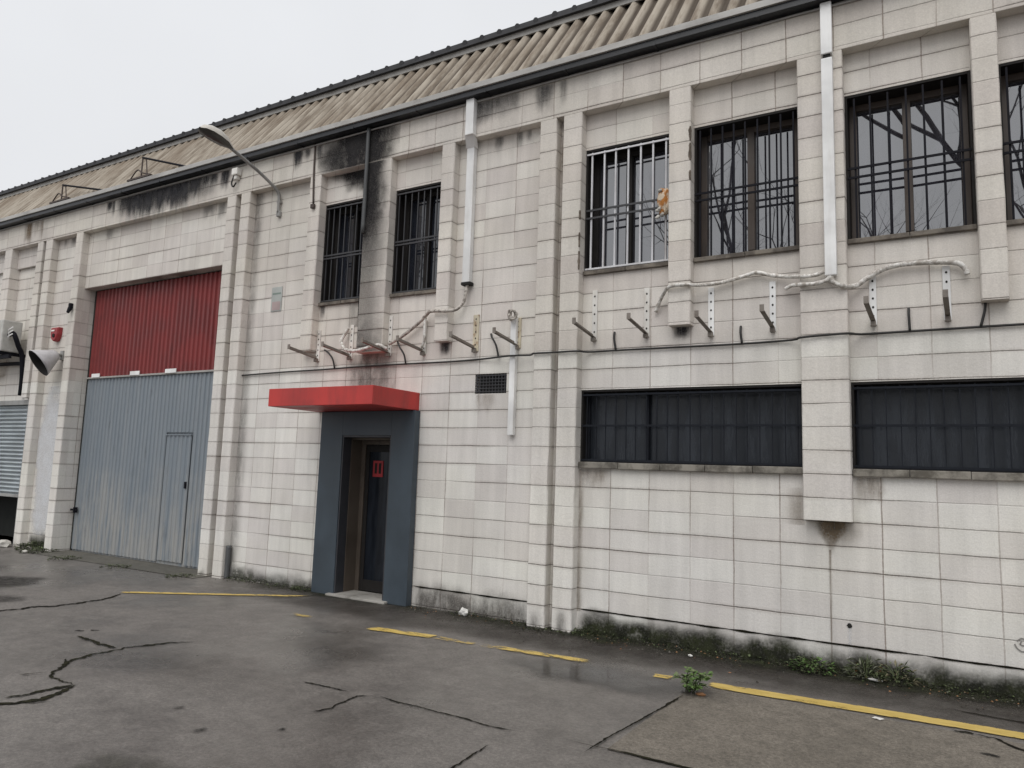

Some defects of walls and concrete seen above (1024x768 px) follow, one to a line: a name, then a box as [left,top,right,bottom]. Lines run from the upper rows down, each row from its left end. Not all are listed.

damp [295,146,321,165]
damp [108,170,229,214]
damp [336,160,385,314]
crack [0,594,119,611]
crack [0,630,195,705]
damp [466,616,1024,726]
crack [575,696,691,768]